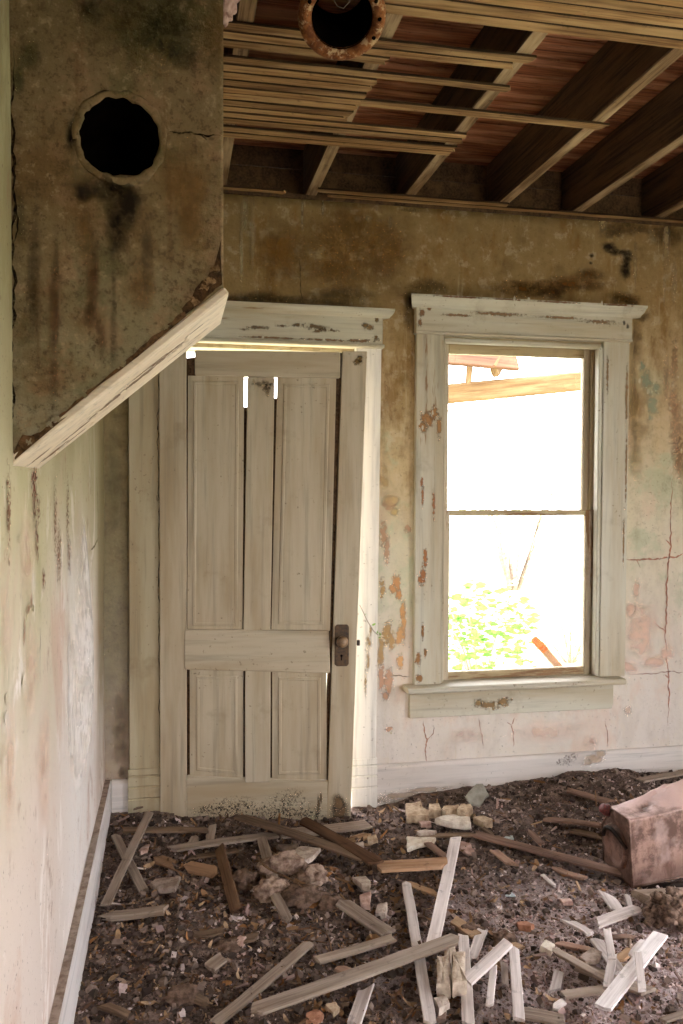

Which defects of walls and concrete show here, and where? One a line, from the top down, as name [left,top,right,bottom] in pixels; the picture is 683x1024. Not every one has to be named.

crack [168,131,214,140]
leakage [503,221,643,298]
peeling [236,318,379,343]
peeling [443,296,577,319]
peeling [546,316,629,328]
leakage [612,293,636,305]
peeling [417,404,442,441]
peeling [380,498,395,564]
peeling [418,549,428,586]
crack [627,482,682,722]
peeling [377,576,427,700]
peeling [475,697,512,713]